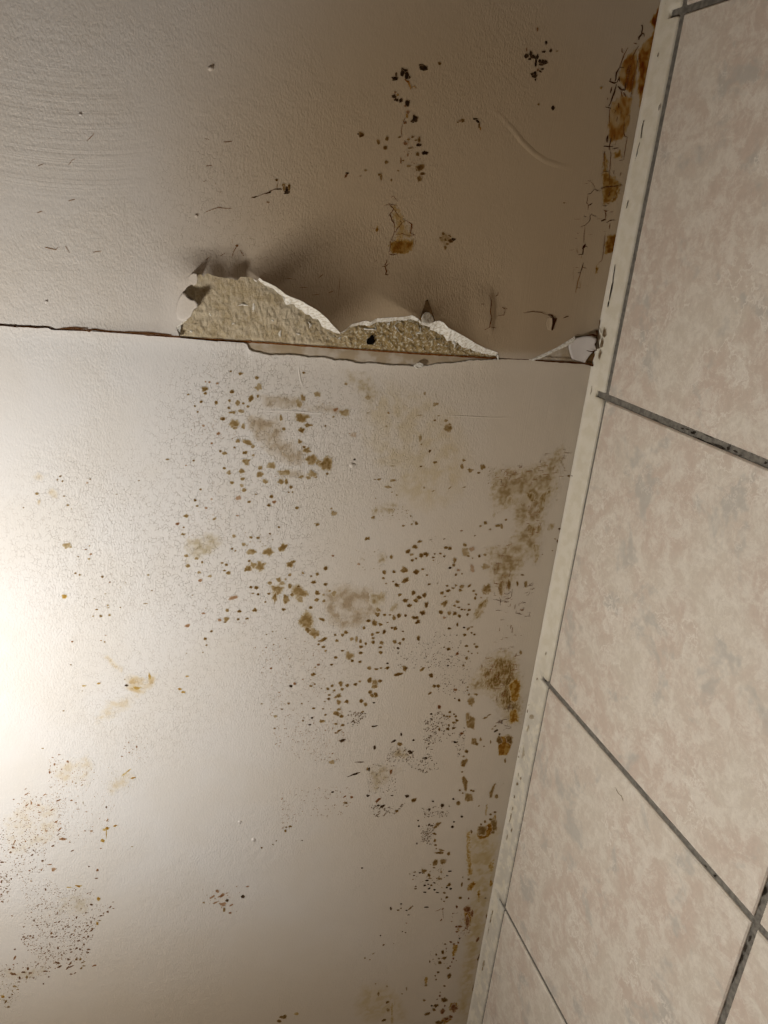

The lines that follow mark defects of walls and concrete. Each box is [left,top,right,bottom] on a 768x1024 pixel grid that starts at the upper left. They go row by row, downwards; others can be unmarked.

leakage [524,27,558,81]
leakage [344,62,442,182]
peeling [180,273,607,366]
leakage [92,635,159,730]
leakage [175,368,570,902]